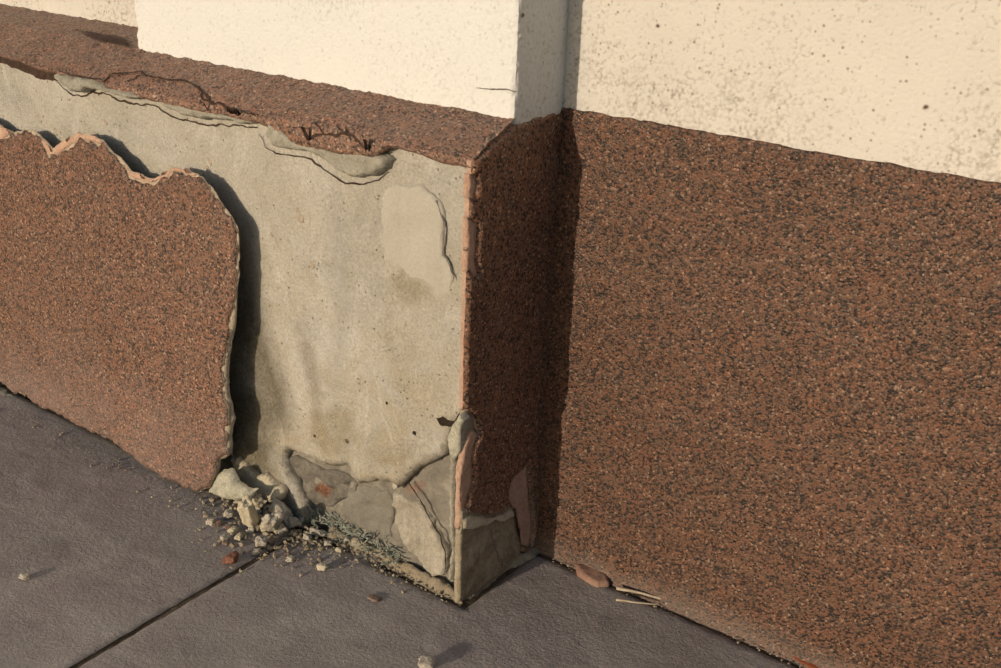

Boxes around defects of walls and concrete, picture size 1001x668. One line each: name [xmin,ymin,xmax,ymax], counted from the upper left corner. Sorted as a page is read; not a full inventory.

crack [55,69,388,185]
peeling [0,63,531,602]